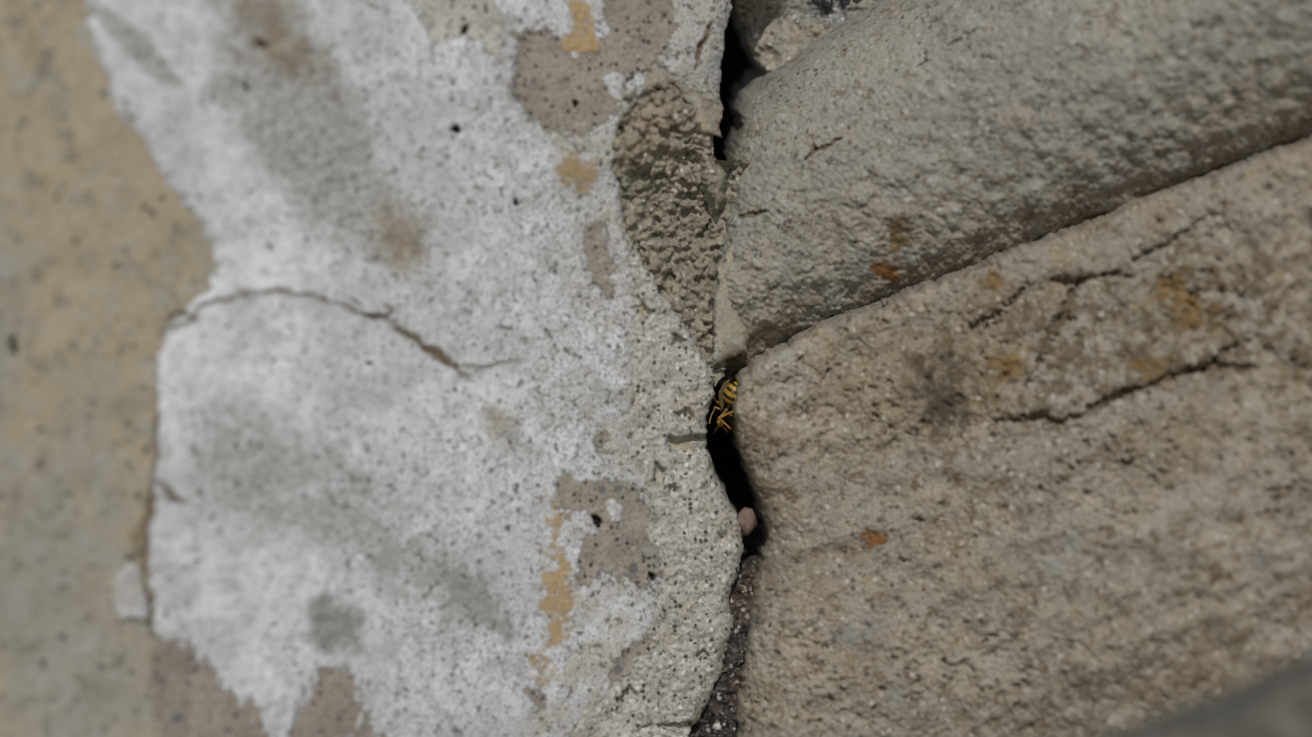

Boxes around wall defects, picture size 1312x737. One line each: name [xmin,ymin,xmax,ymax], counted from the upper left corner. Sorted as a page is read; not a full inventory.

corrosion [560,0,599,53]
crack [695,10,757,161]
spalling [410,0,751,381]
crack [161,289,493,378]
crack [969,224,1194,373]
crack [997,336,1256,425]
peeling [110,561,399,737]
peeling [523,687,550,715]
corrosion [529,493,573,686]
peeling [608,632,656,685]
spalling [619,725,690,737]
crack [689,382,766,737]